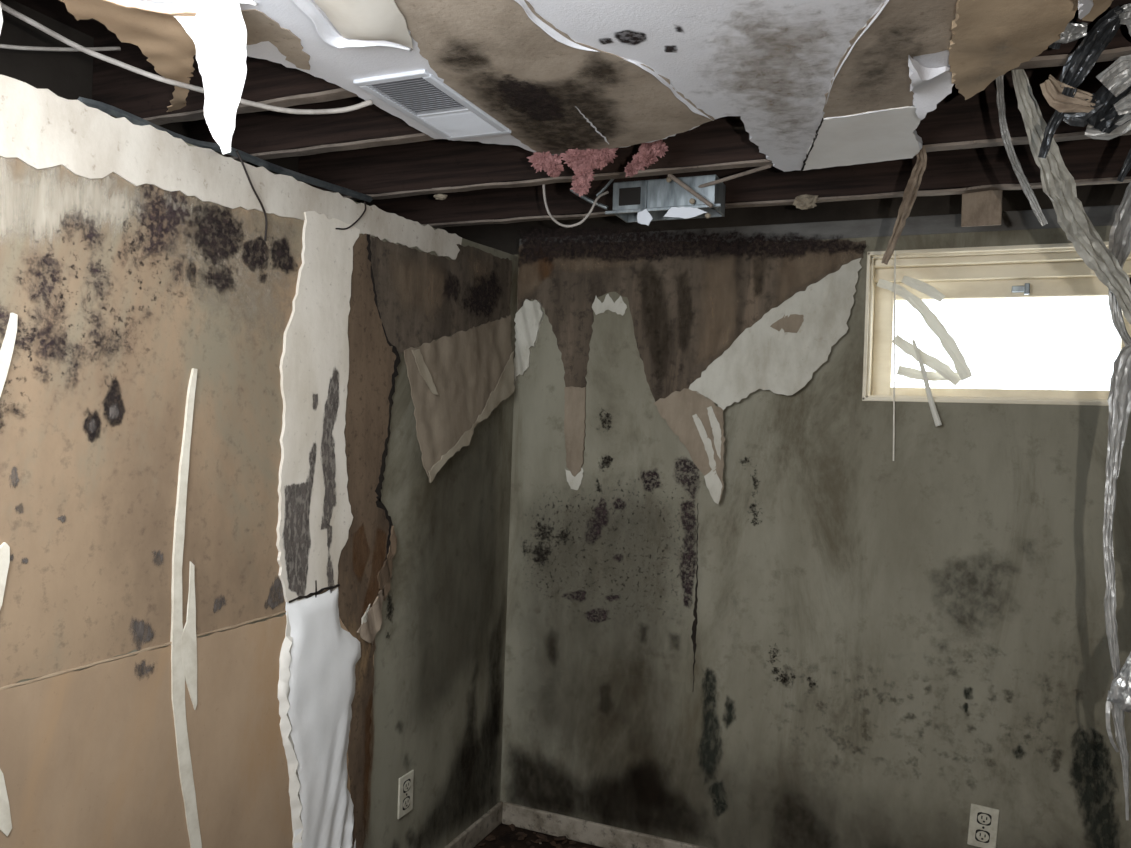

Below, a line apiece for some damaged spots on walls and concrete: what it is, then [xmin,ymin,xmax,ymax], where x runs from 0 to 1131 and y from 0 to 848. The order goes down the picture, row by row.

peeling [241,9,310,70]
damp [444,46,617,152]
peeling [394,0,715,155]
damp [599,30,646,45]
peeling [822,0,958,118]
damp [0,254,134,381]
damp [123,184,297,312]
damp [519,226,865,364]
damp [83,379,125,442]
crack [367,234,401,596]
peeling [0,74,866,848]
damp [523,456,699,622]